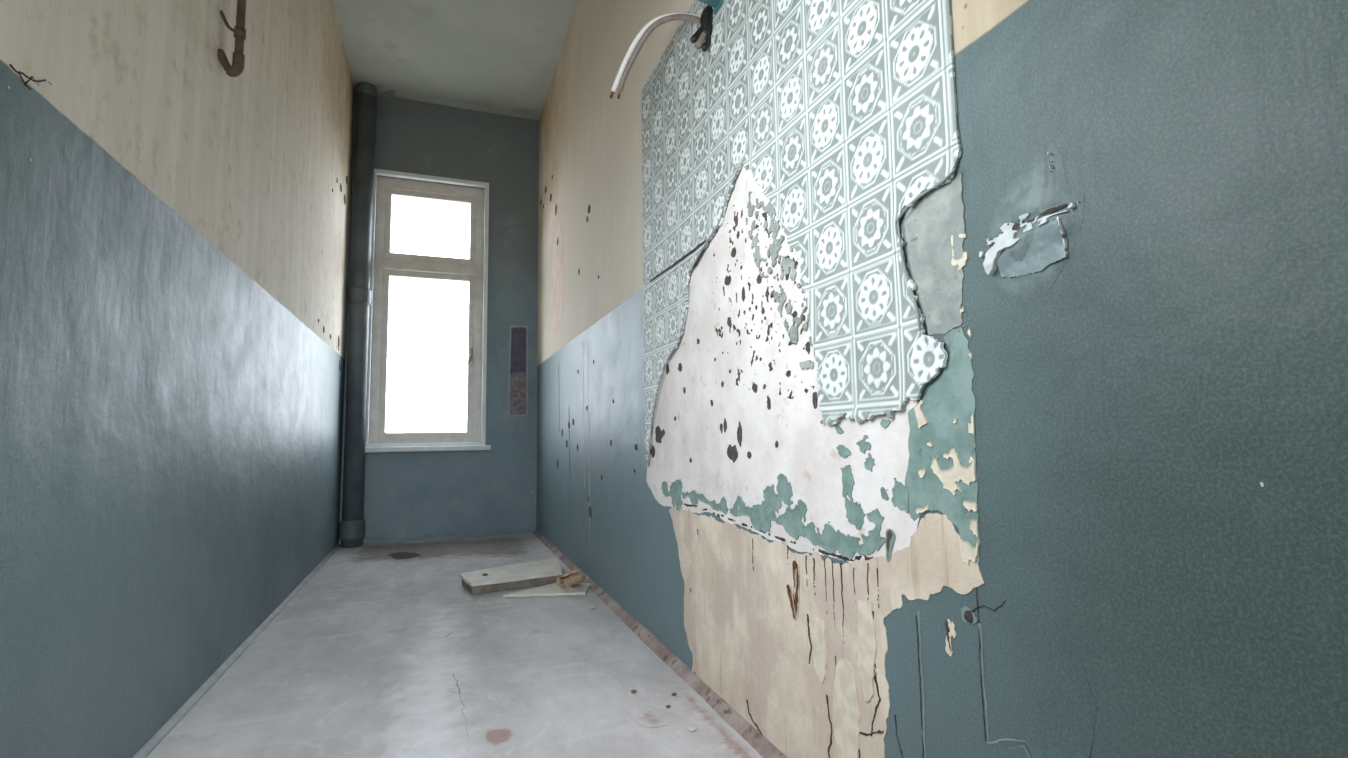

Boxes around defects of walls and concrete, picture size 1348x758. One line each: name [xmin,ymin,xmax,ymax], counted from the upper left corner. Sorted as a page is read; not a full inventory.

peeling [633,165,985,758]
spalling [951,139,1085,308]